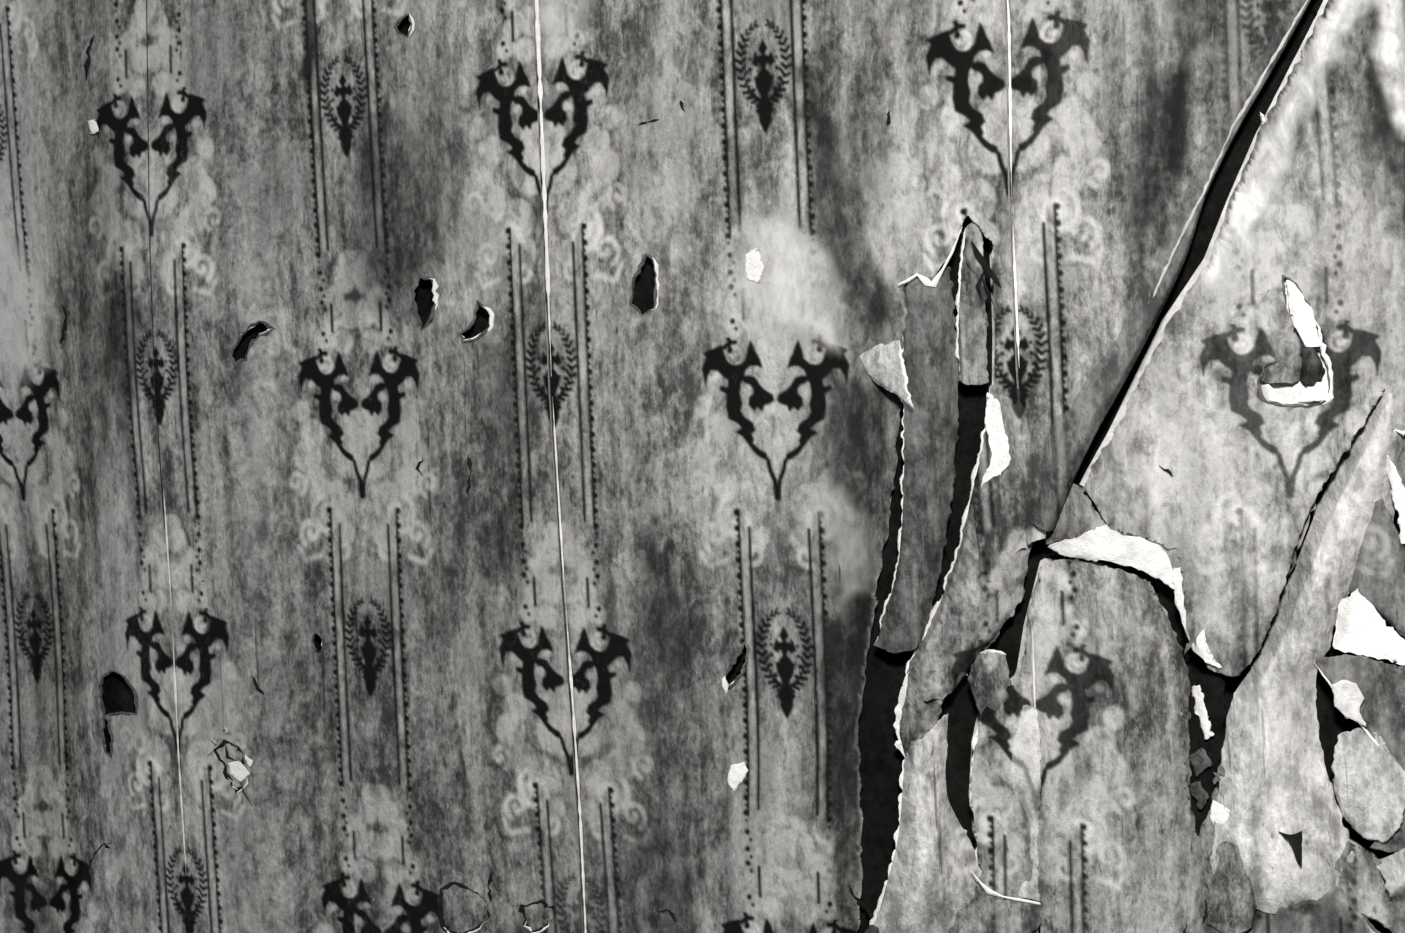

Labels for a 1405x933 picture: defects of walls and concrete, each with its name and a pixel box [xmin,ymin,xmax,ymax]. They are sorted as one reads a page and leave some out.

flaking render [232,322,271,362]
flaking render [414,278,439,328]
flaking render [461,305,494,341]
flaking render [632,256,660,314]
peeling [955,222,989,385]
flaking render [1260,278,1334,405]
peeling [1386,435,1405,544]
peeling [1048,524,1222,668]
flaking render [102,672,136,755]
peeling [1314,588,1405,771]
peeling [1210,800,1230,826]
peeling [1369,810,1405,903]